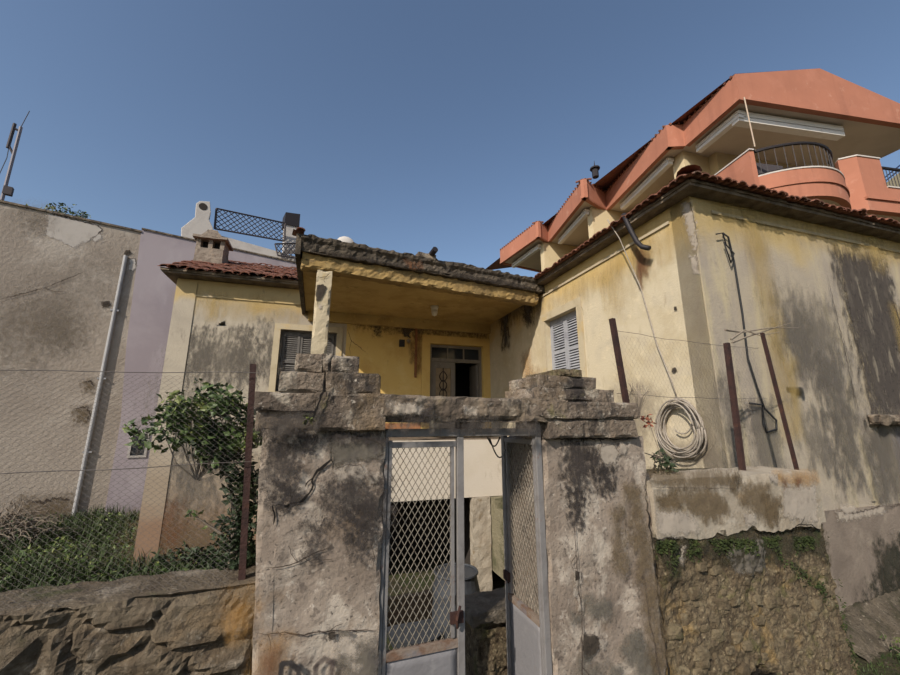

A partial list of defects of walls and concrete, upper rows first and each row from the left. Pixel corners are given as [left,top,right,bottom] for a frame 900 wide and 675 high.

crack [2,271,84,299]
leakage [185,320,272,387]
leakage [771,243,900,504]
spalling [71,405,91,425]
crack [272,443,334,525]
leakage [648,379,785,528]
flaking render [770,474,819,523]
leakage [559,439,684,675]
flaking render [656,511,698,564]
spalling [728,539,766,575]
leakage [858,533,900,602]
crack [260,624,377,653]